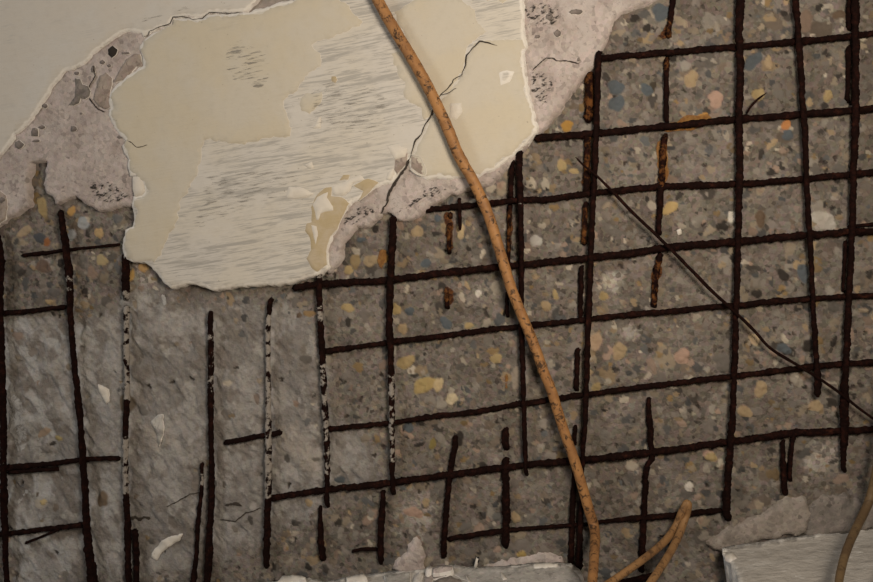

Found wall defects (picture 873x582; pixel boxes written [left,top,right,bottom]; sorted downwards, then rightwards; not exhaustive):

peeling [249,0,290,13]
crack [381,40,494,213]
rust [656,114,711,182]
spalling [0,32,590,582]
spalling [478,0,873,582]